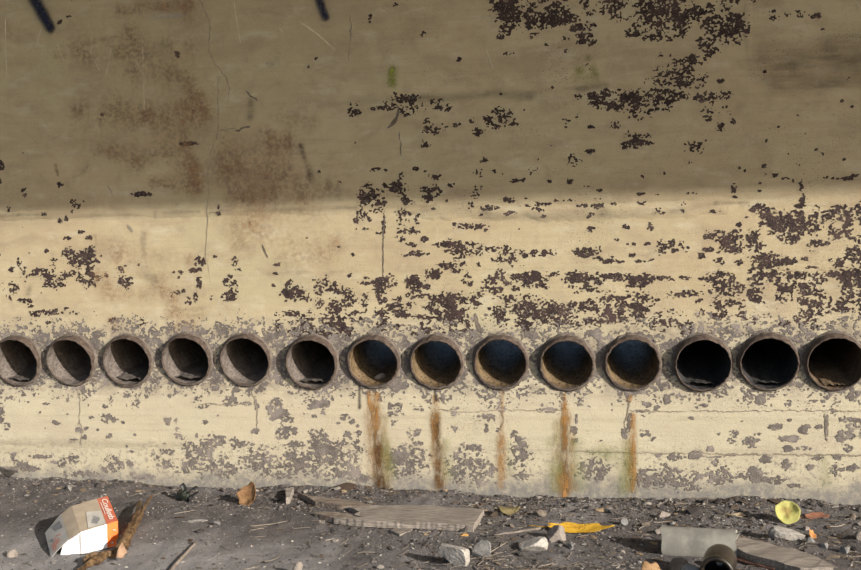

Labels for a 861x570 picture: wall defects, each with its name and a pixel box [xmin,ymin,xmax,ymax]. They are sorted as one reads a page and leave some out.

peeling [769,9,825,30]
peeling [488,0,751,150]
crack [199,0,257,283]
peeling [347,92,525,148]
peeling [567,149,595,167]
peeling [684,139,707,164]
rust [368,393,385,488]
rust [432,412,442,487]
rust [557,404,570,498]
rust [627,414,636,490]